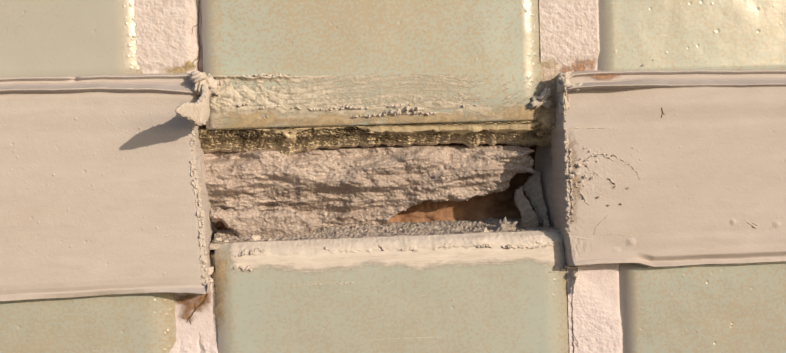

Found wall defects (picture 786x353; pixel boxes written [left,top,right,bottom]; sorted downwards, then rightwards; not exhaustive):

peeling [291,104,436,119]